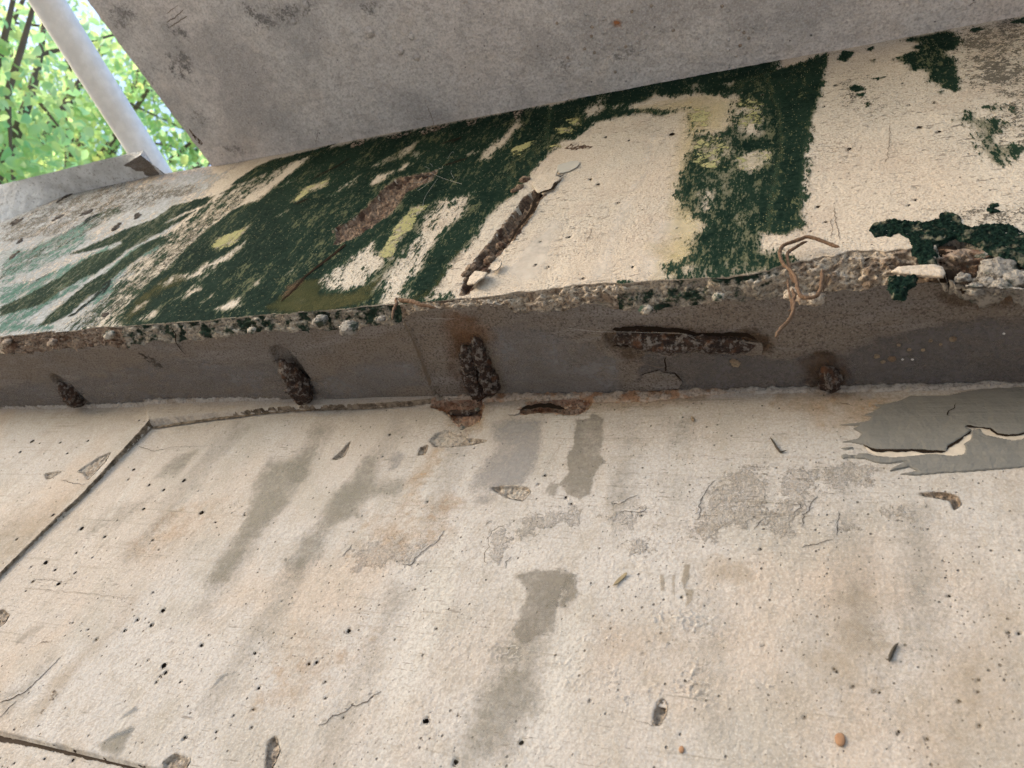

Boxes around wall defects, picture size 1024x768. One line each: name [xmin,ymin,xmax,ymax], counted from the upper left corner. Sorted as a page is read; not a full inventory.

spalling [0,237,1024,368]
rust [57,381,86,408]
rust [278,358,314,405]
rust [453,337,501,402]
rust [612,326,772,360]
rust [818,365,849,400]
damp [562,415,604,498]
damp [212,463,307,581]
spalling [490,485,530,501]
damp [513,571,576,650]